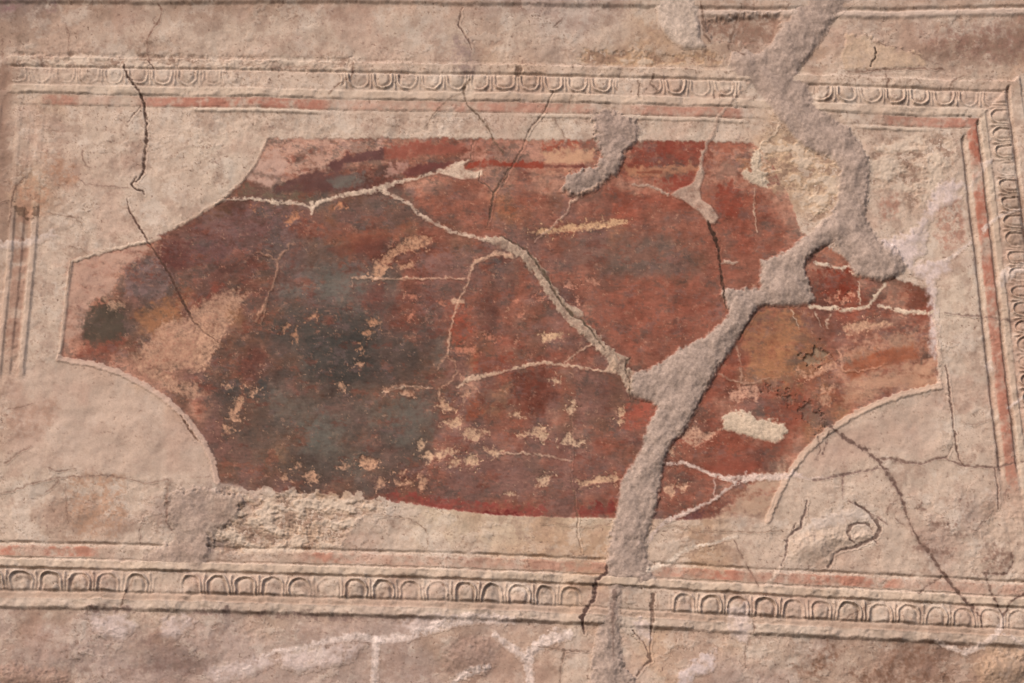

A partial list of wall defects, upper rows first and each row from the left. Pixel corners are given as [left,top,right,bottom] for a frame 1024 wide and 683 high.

spalling [575,47,724,69]
spalling [840,32,928,71]
crack [49,0,221,344]
spalling [740,127,839,226]
peeling [526,212,636,241]
peeling [333,309,384,397]
crack [214,0,1024,683]
flaking render [723,338,840,436]
peeling [818,282,894,340]
spalling [211,326,591,556]
peeling [573,471,622,493]
peeling [667,418,721,459]